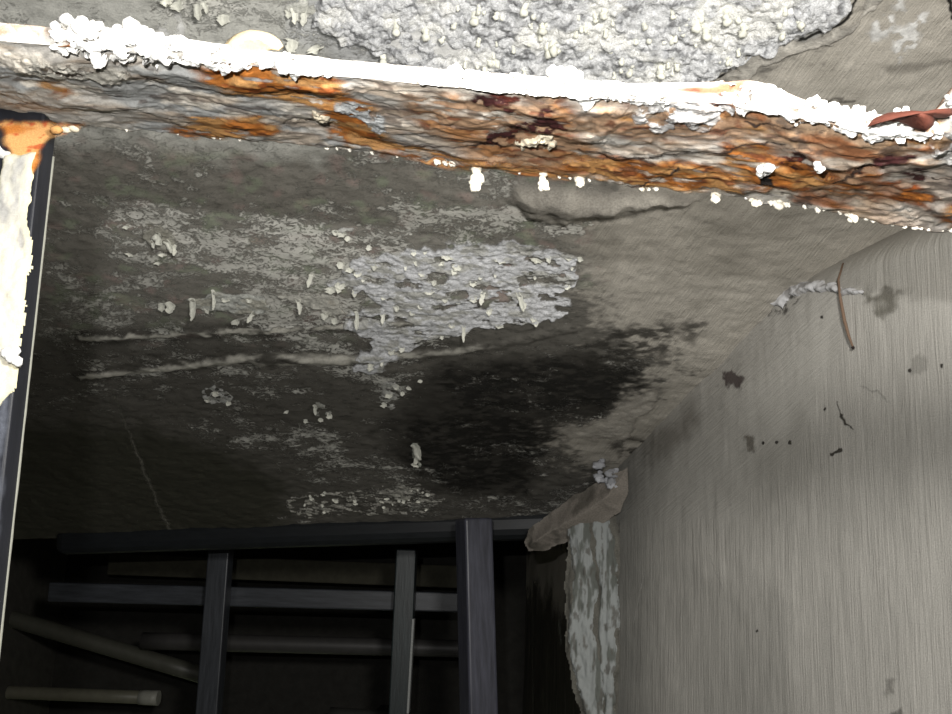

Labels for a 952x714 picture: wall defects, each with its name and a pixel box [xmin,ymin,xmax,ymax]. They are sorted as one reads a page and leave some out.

corrosion [225,30,284,51]
corrosion [0,122,82,174]
corrosion [172,115,279,140]
corrosion [198,63,935,206]
corrosion [866,108,952,155]
damp [0,147,36,406]
damp [410,325,673,493]